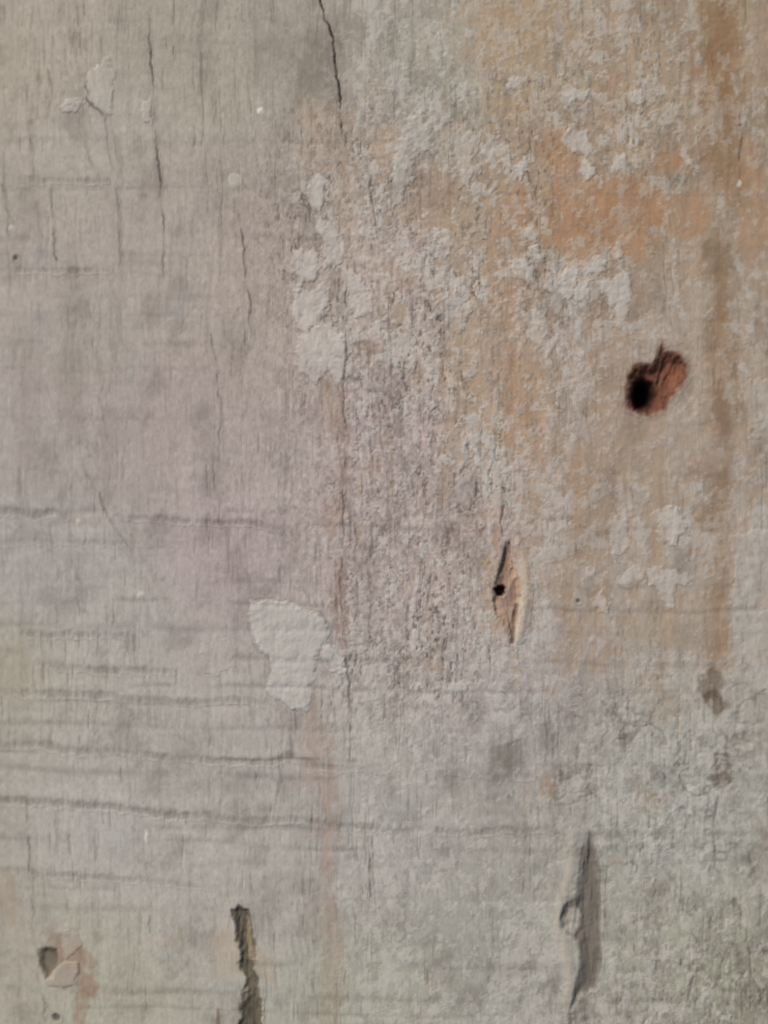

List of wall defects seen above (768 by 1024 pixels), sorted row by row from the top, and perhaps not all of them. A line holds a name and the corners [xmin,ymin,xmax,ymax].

peeling [60,56,116,116]
crack [147,9,176,281]
crack [318,0,395,239]
peeling [288,172,374,387]
peeling [247,598,351,713]
peeling [45,929,82,988]
spalling [228,901,265,1024]
spalling [548,830,607,1014]